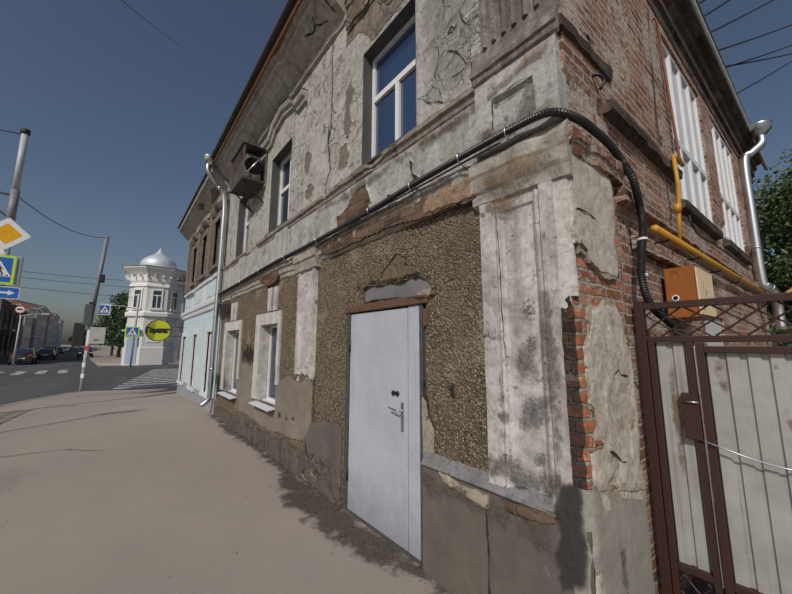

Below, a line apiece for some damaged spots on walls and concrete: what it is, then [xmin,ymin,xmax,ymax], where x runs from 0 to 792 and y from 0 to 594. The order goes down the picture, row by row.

crack [303,0,335,37]
crack [418,0,479,103]
crack [325,44,336,194]
flaking render [336,183,372,227]
flaking render [559,273,647,520]